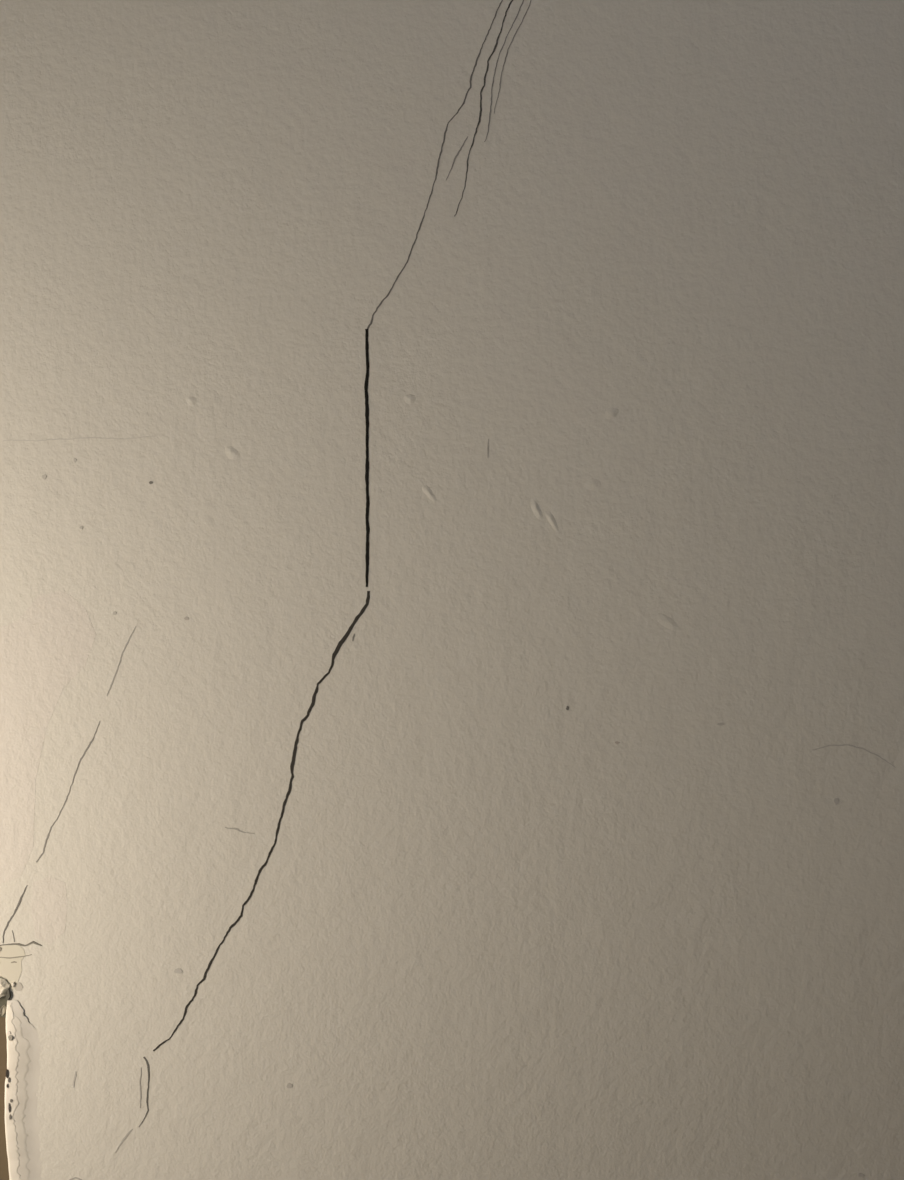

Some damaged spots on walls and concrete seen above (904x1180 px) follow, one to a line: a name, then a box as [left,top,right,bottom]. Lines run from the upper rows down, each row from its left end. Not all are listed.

crack [115,0,531,1153]